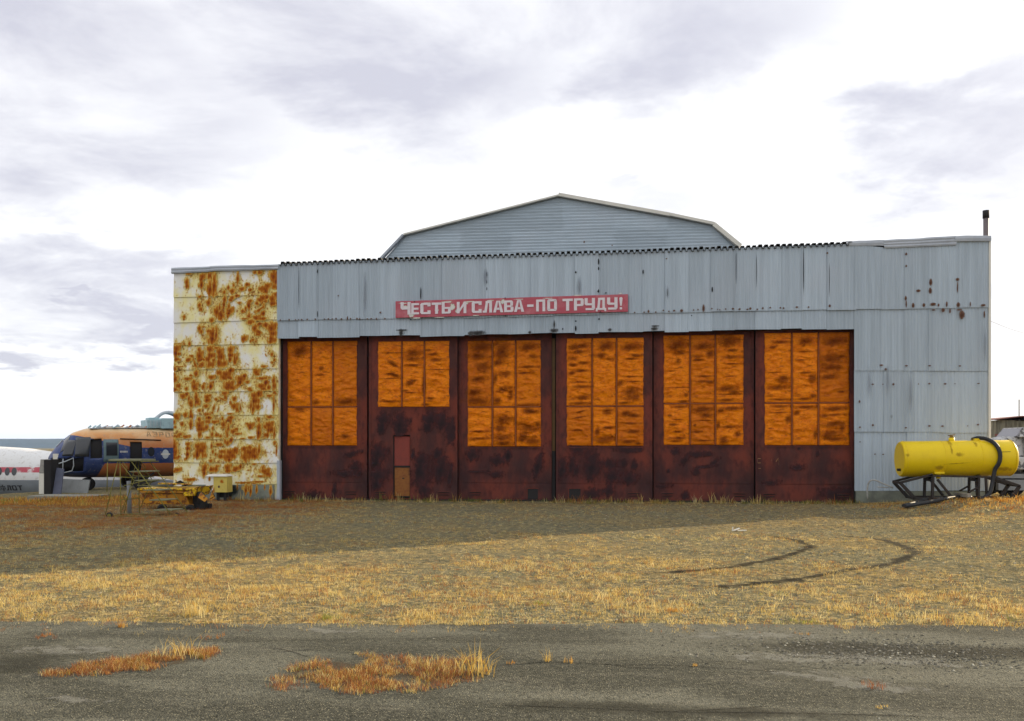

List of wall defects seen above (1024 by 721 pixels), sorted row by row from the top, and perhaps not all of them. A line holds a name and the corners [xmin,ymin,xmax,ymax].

corrosion [173,270,386,497]
corrosion [905,278,986,319]